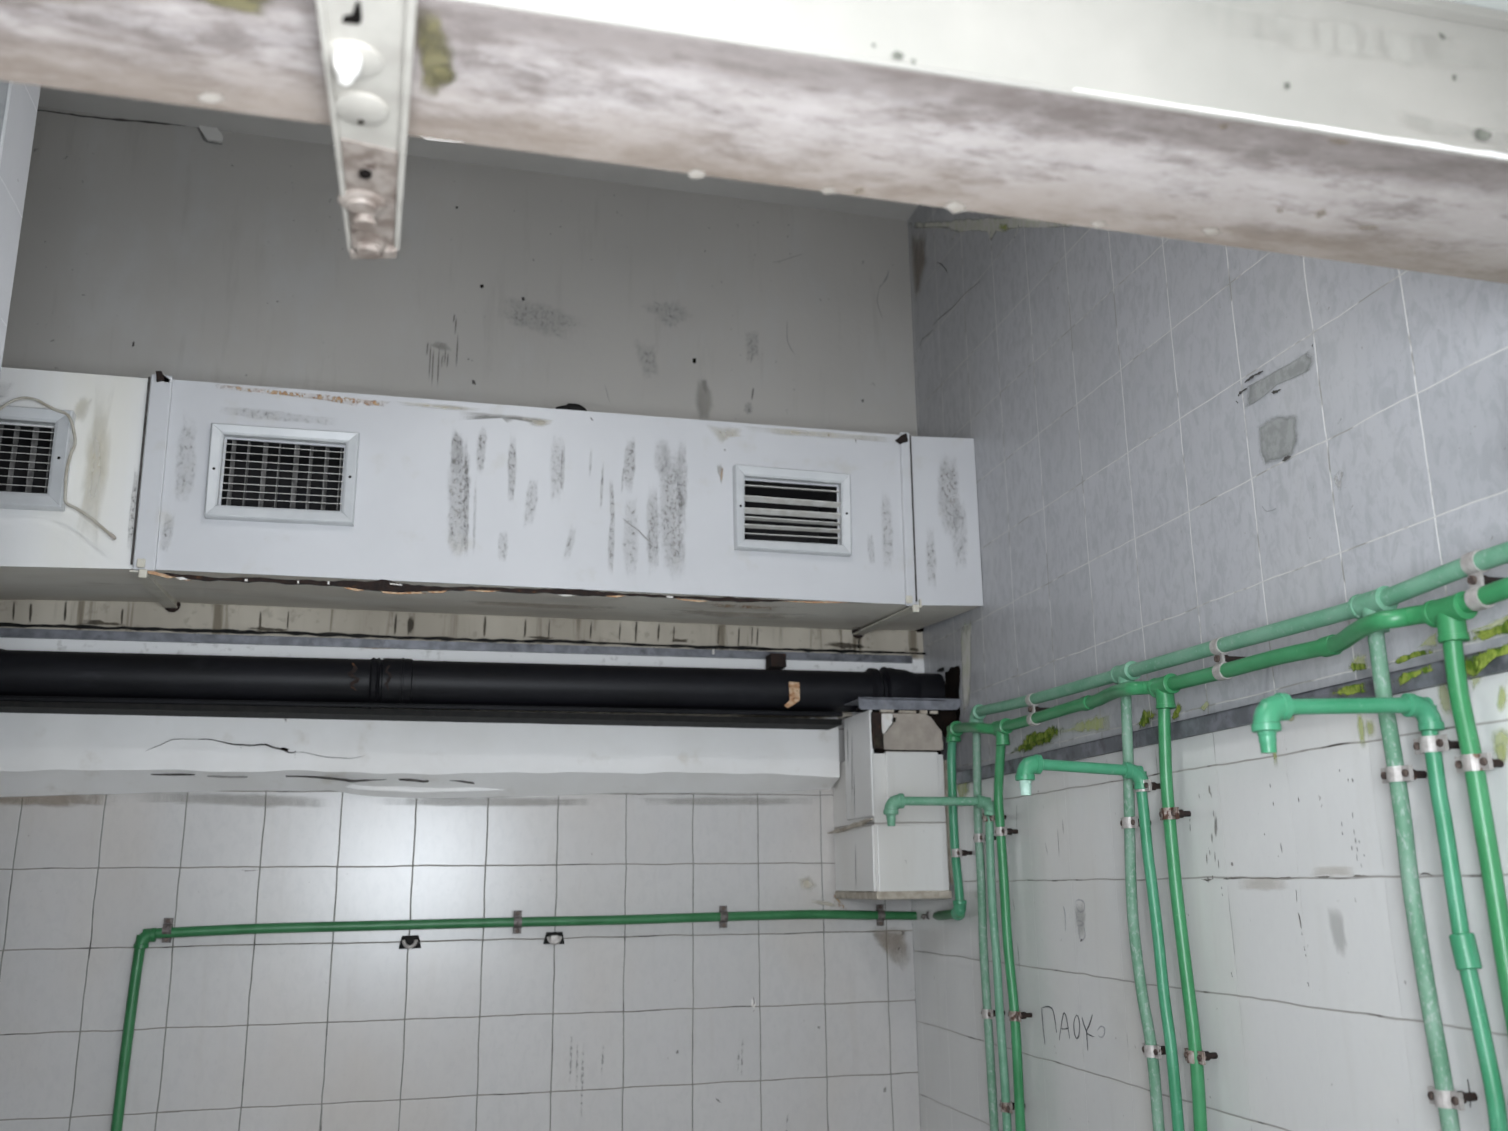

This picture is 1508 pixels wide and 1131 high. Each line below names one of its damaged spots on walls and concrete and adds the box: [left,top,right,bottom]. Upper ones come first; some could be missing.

mould [418,18,456,90]
flaking render [915,217,1071,240]
crack [146,738,474,784]
damp [111,541,1508,1131]